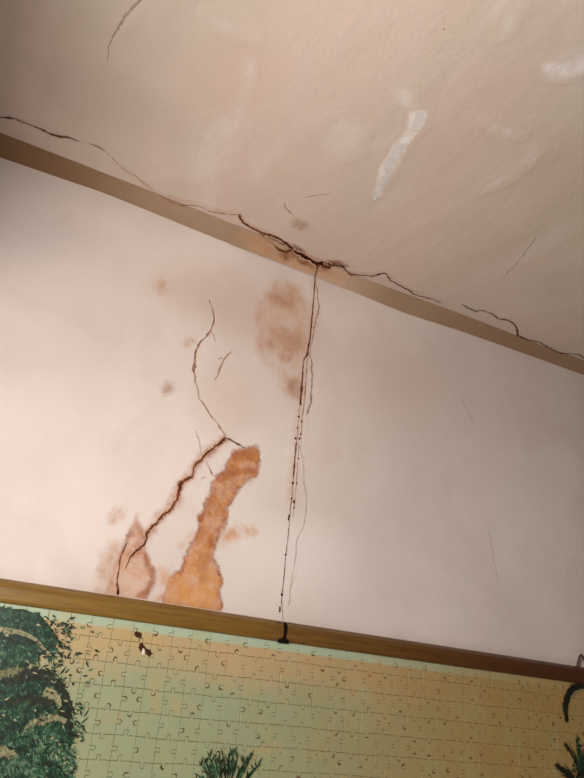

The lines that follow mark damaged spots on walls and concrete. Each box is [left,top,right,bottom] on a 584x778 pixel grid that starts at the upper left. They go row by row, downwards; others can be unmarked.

peeling [363,79,439,203]
crack [0,117,442,615]
water stain [229,212,356,408]
crack [462,304,584,358]
rust [155,436,270,612]